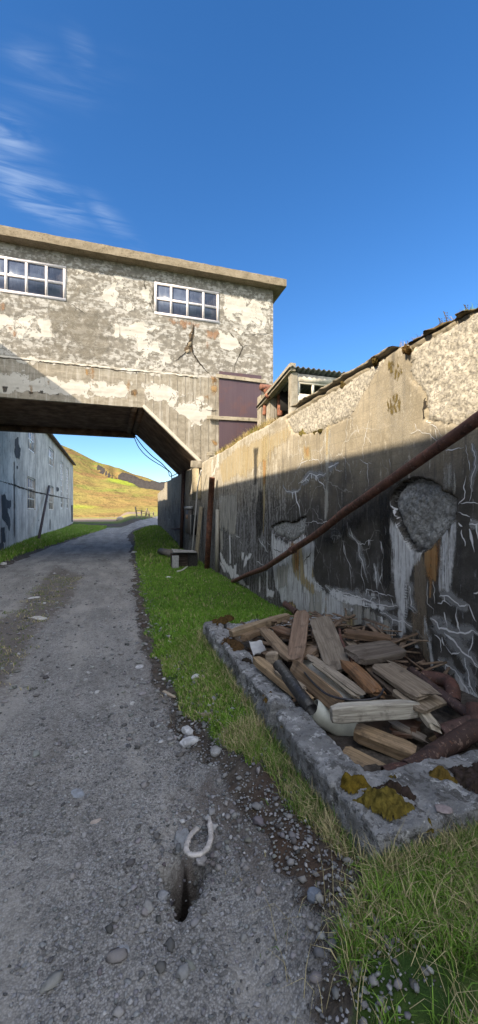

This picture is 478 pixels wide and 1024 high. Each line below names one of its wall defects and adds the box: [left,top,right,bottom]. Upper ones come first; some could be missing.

crack [0,357,140,372]
peeling [0,269,213,429]
crack [175,324,268,377]
peeling [219,295,271,351]
spalling [272,516,307,540]
leakage [215,425,433,666]
crack [283,420,478,697]
spalling [390,476,458,552]